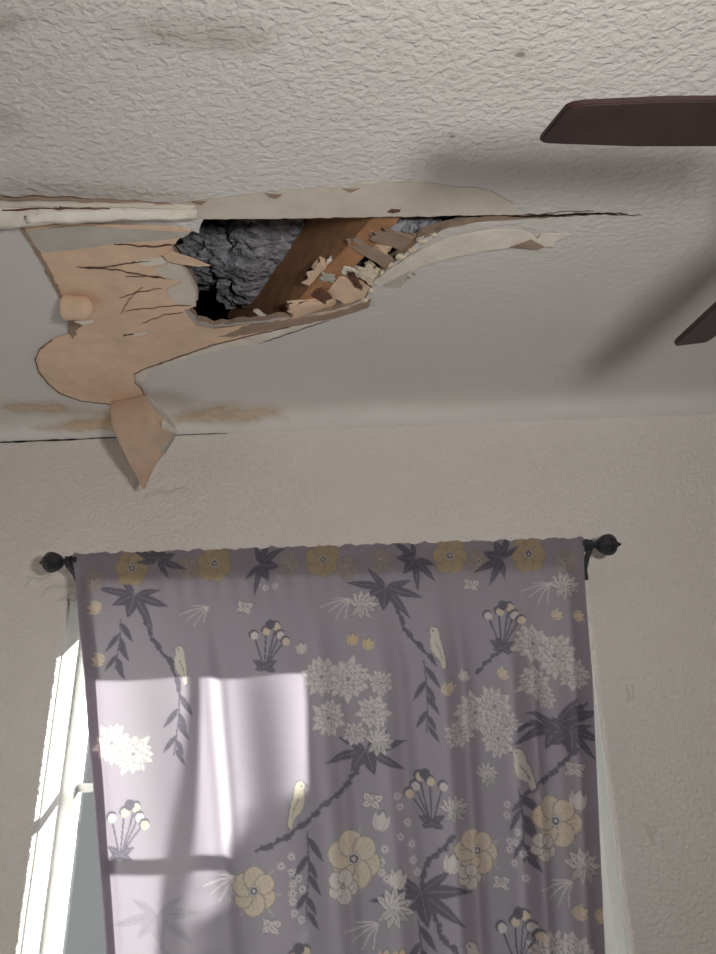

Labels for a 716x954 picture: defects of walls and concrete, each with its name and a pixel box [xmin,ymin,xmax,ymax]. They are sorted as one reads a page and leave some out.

peeling [178,181,516,220]
peeling [373,229,571,288]
peeling [135,320,329,382]